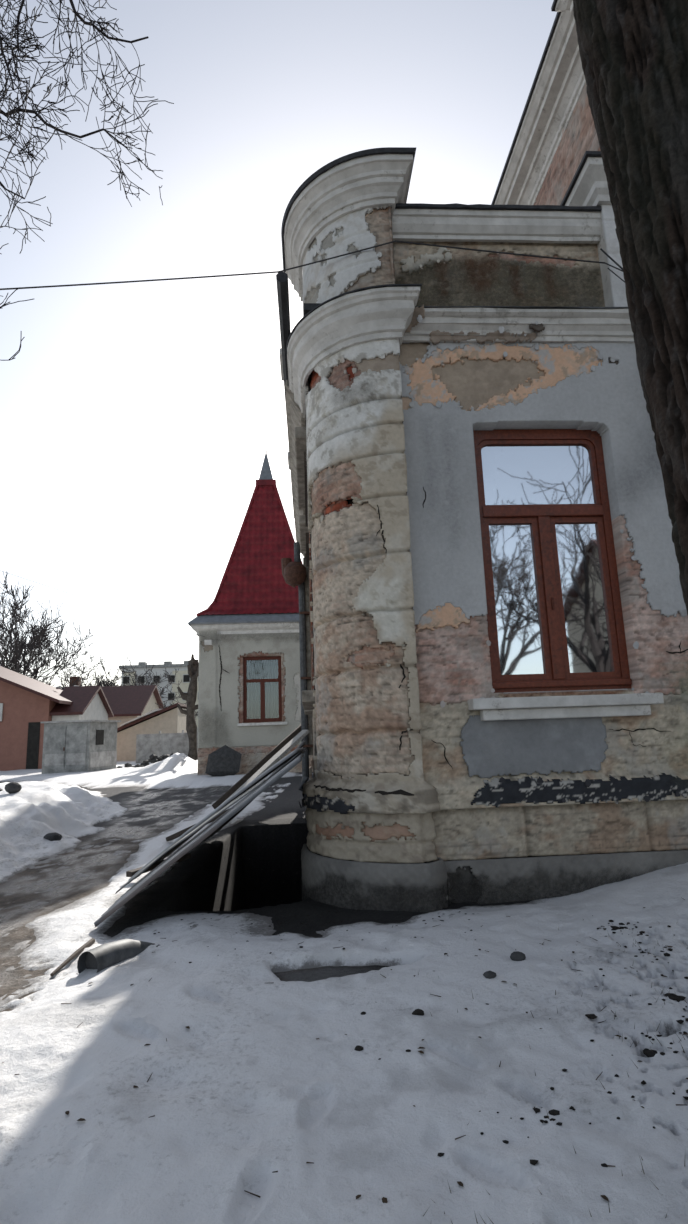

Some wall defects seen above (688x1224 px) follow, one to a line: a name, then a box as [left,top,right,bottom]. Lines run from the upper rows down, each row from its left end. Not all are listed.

spalling [304,206,452,303]
flaking render [310,321,618,411]
crack [376,505,387,553]
spalling [310,461,503,780]
spalling [612,516,688,695]
peeling [299,794,416,842]
peeling [471,773,688,807]